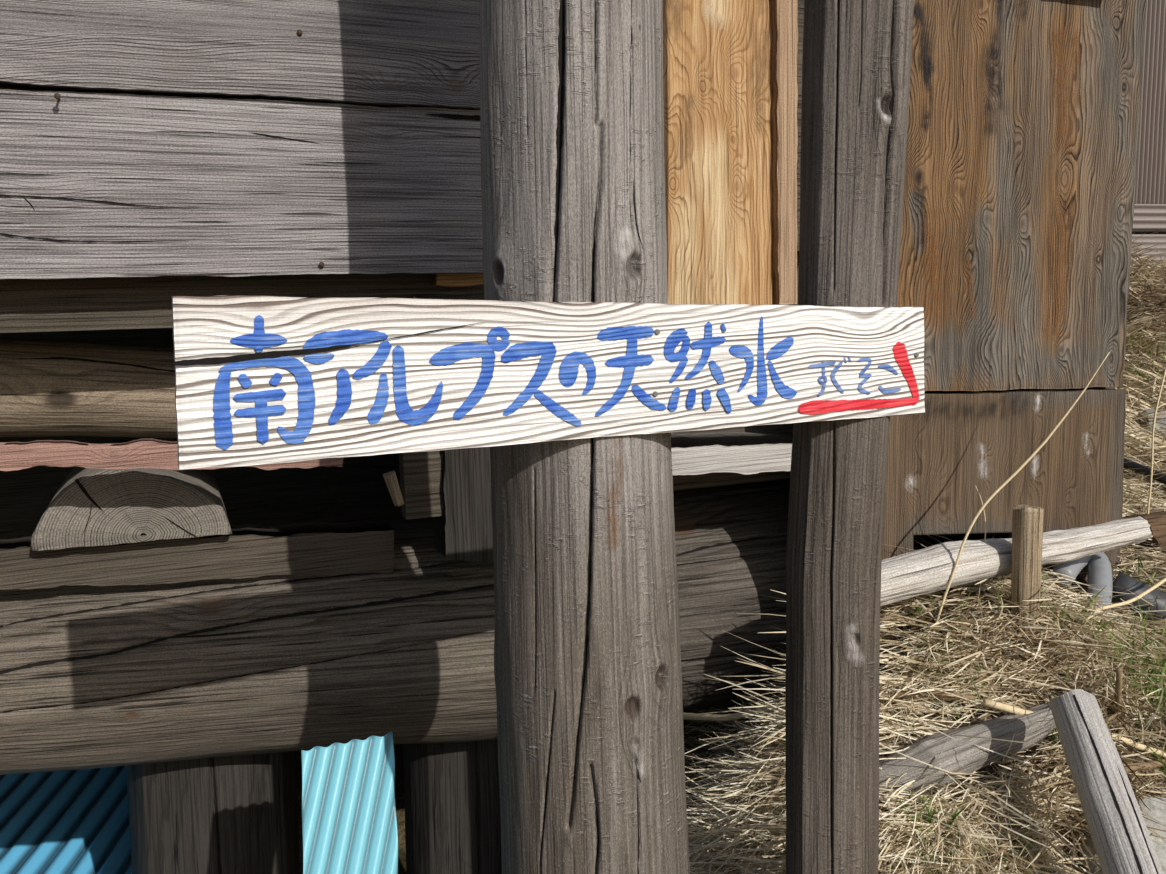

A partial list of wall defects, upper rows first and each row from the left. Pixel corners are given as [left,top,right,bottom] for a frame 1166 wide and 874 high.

crack [591,0,599,74]
crack [553,0,565,302]
crack [630,0,643,248]
crack [591,180,599,302]
crack [3,632,480,713]
crack [0,561,494,674]
crack [534,438,599,874]